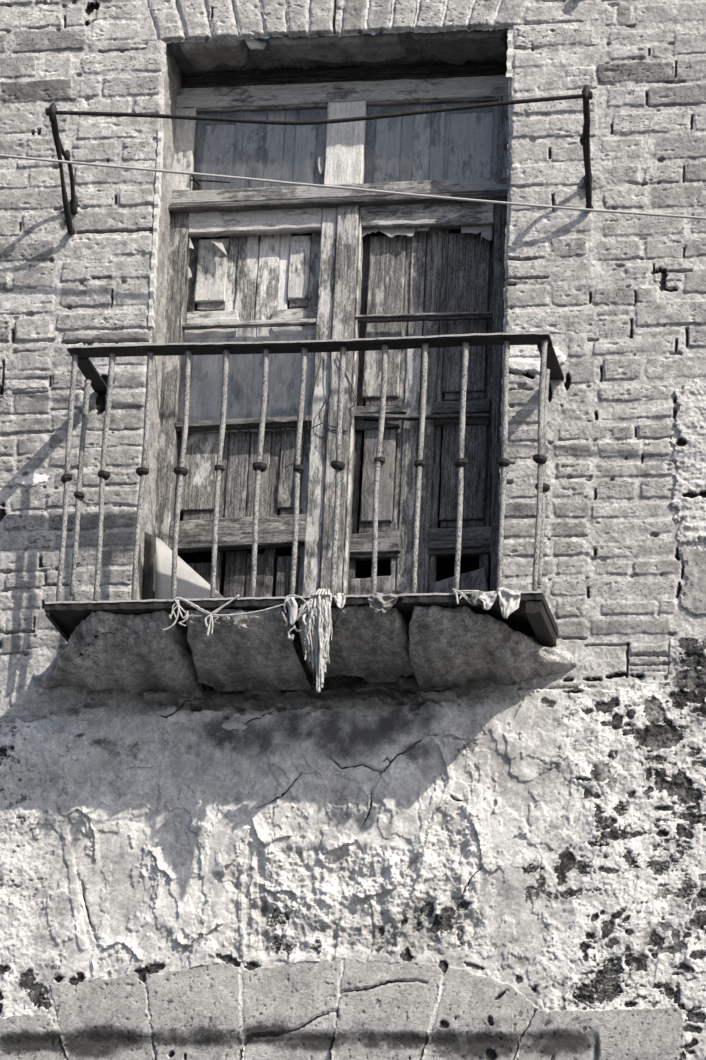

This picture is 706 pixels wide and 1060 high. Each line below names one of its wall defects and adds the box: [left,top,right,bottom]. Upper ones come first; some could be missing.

crack [157,699,197,718]
damp [207,705,429,759]
crack [388,687,453,706]
crack [258,773,302,808]
crack [331,735,437,828]
spalling [521,637,706,901]
crack [81,882,97,940]
spalling [0,965,85,1010]
spalling [573,874,706,1060]
crack [241,980,425,1060]